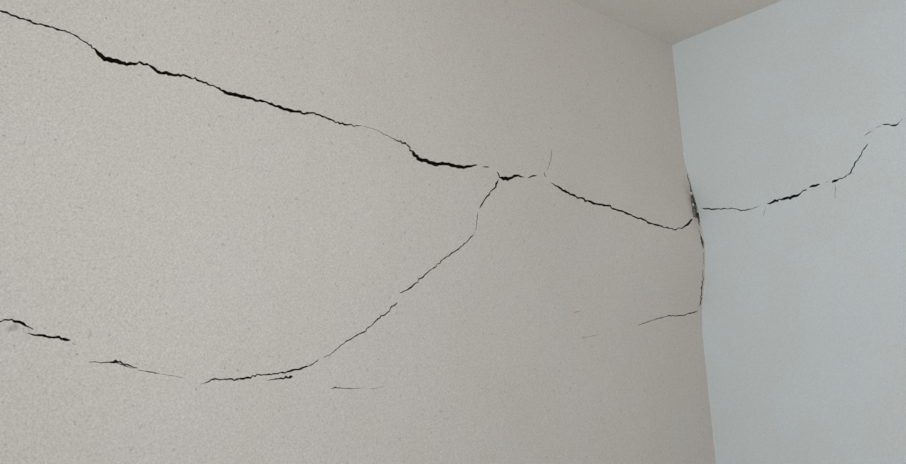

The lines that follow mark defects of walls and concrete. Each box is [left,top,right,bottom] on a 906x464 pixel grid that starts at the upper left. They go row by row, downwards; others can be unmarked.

crack [0,10,899,384]